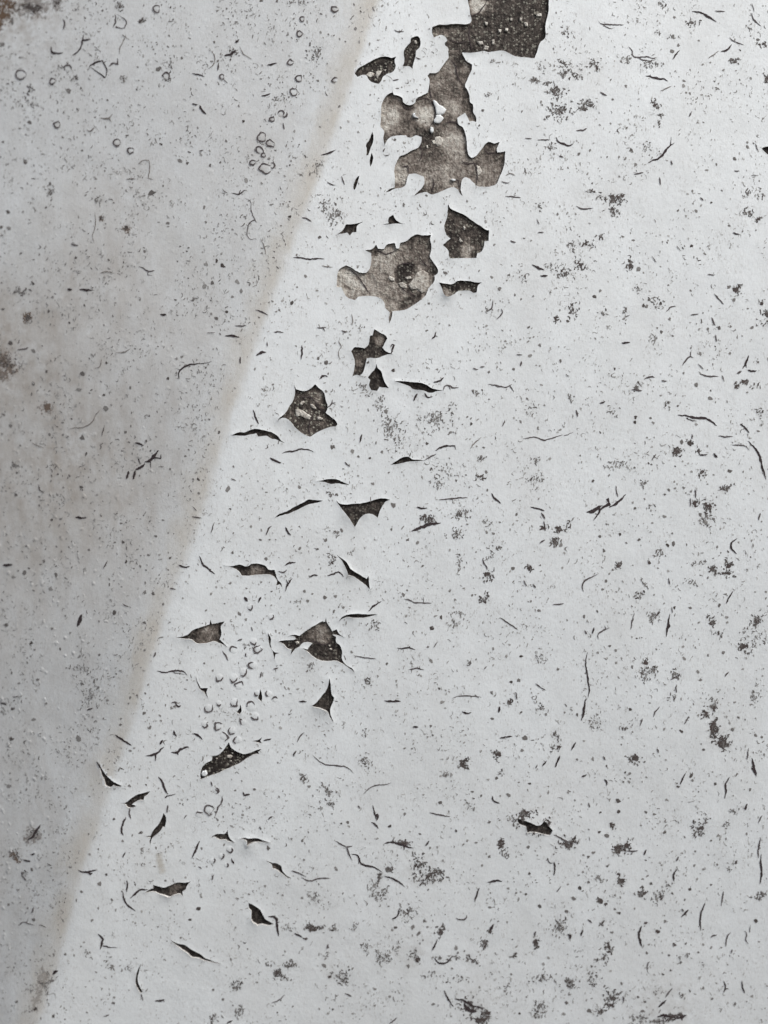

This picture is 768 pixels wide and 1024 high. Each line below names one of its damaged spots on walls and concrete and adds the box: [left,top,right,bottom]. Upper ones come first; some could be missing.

peeling [355,36,421,84]
peeling [366,0,549,196]
peeling [337,204,489,393]
peeling [278,384,337,437]
peeling [337,498,389,527]
spalling [228,563,282,587]
peeling [177,619,227,647]
peeling [268,614,376,671]
peeling [312,679,334,721]
peeling [200,738,261,780]
peeling [518,819,553,835]
peeling [145,882,190,897]